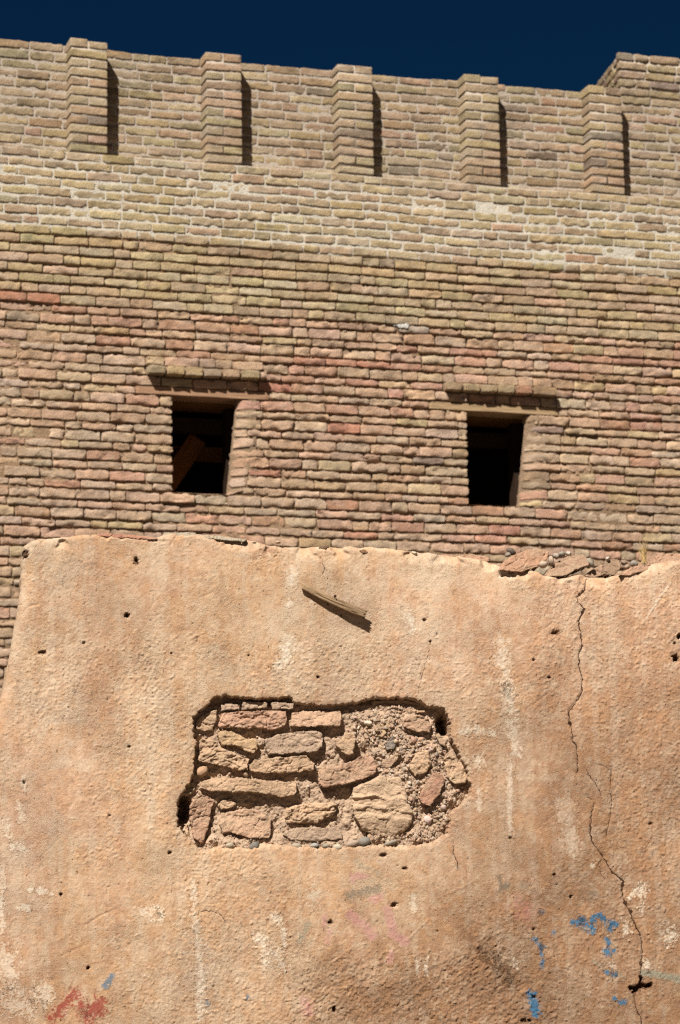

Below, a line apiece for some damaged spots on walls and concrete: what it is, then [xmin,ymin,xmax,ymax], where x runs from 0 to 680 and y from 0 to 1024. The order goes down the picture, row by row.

spalling [178,697,469,858]
crack [568,579,643,1024]